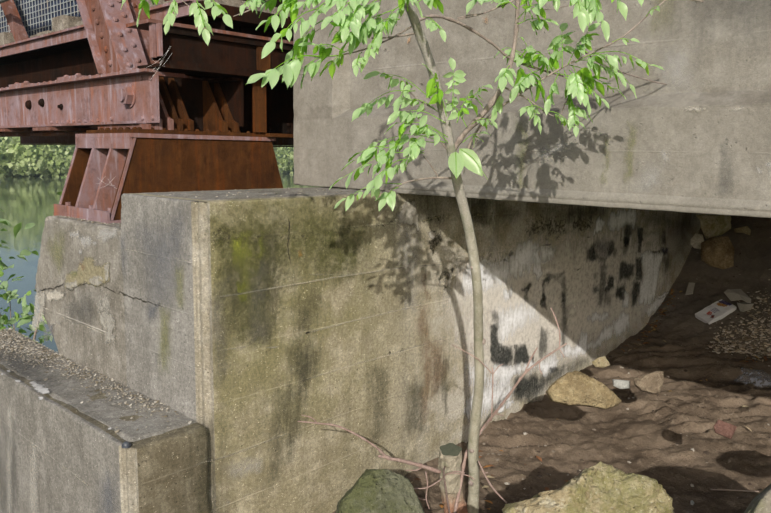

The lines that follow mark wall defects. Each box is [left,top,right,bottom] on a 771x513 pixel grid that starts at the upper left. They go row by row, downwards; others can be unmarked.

spalling [32,231,115,342]
crack [35,272,163,307]